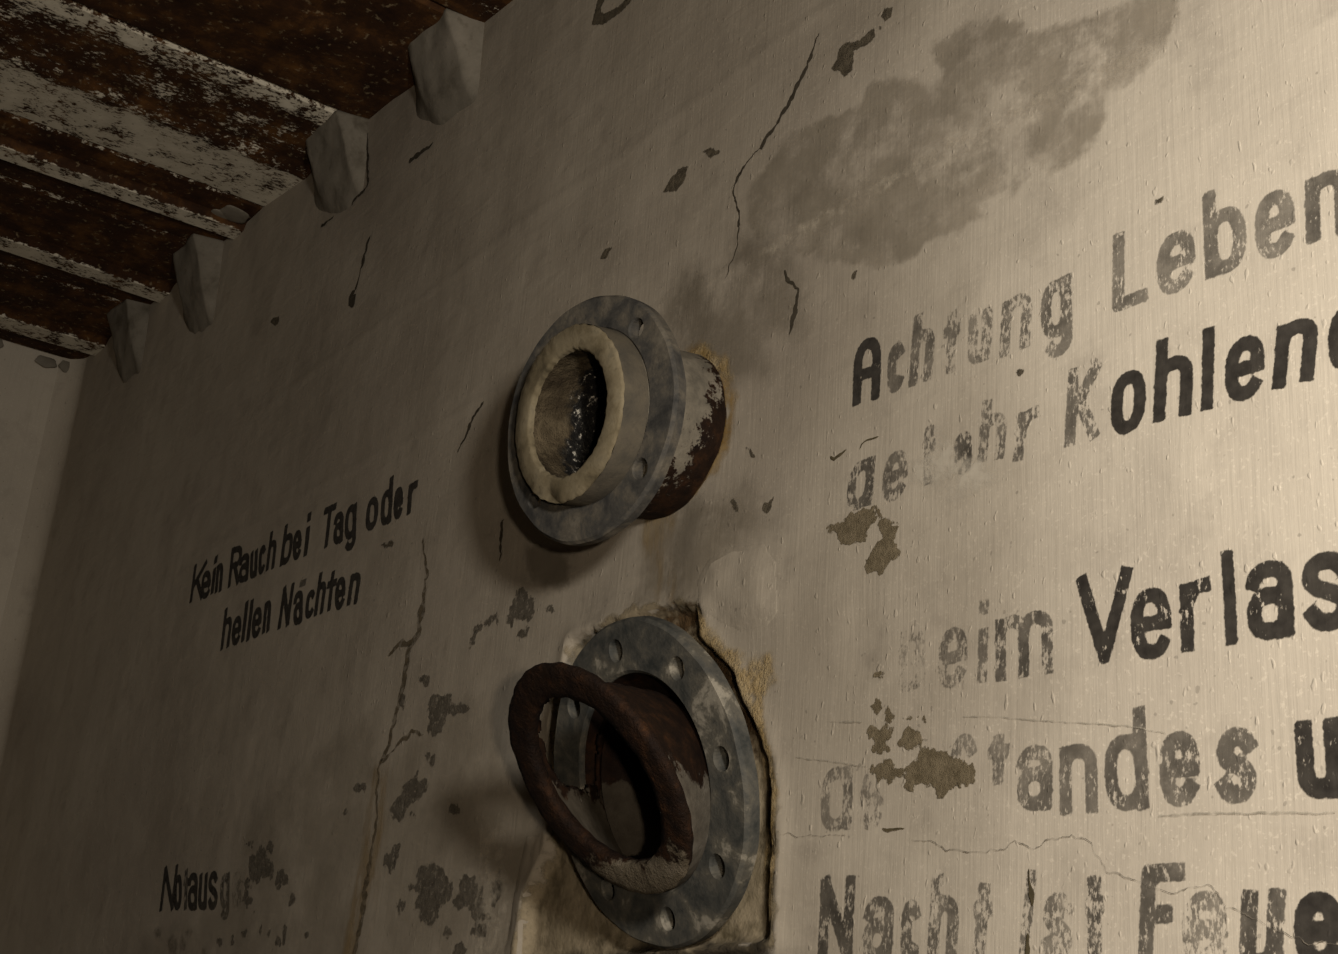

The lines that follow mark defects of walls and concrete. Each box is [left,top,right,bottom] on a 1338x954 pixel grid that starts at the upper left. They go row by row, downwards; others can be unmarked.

crack [725,34,819,278]
crack [784,270,799,334]
corrosion [707,375,734,475]
peeling [826,505,901,576]
peeling [470,587,555,648]
crack [352,539,429,954]
peeling [390,674,470,822]
peeling [511,597,778,954]
peeling [866,698,976,799]
spalling [383,843,400,873]
crack [915,834,1092,853]
peeling [397,863,503,954]